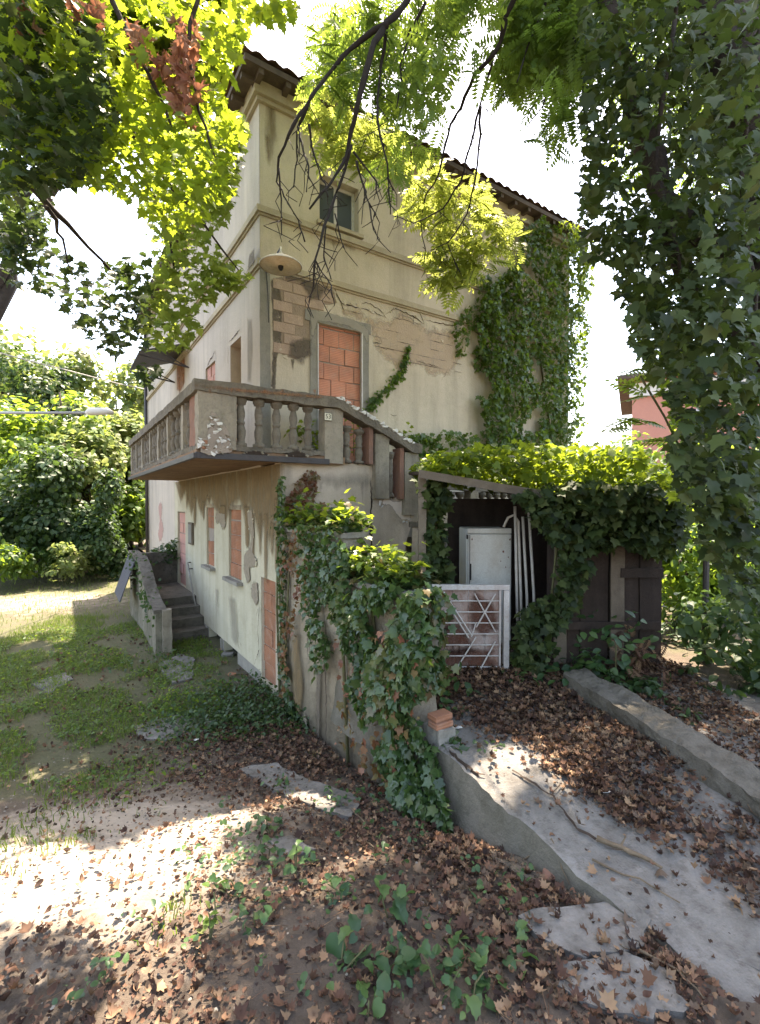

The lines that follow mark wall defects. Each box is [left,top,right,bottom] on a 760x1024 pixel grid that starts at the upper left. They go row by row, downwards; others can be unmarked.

water stain [271,276,369,389]
flaking render [273,276,462,374]
crack [335,290,454,374]
spalling [197,412,270,456]
water stain [176,463,283,583]